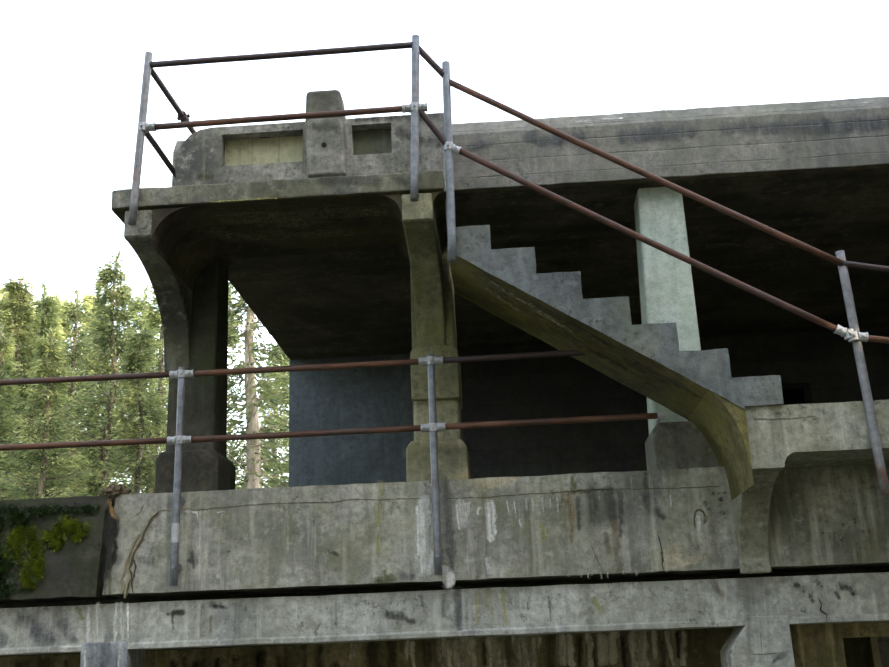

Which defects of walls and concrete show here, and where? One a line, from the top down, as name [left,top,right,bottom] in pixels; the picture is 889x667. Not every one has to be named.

leakage [66,496,119,667]
leakage [101,602,130,667]
crack [121,486,721,598]
leakage [349,494,506,667]
leakage [511,630,686,667]